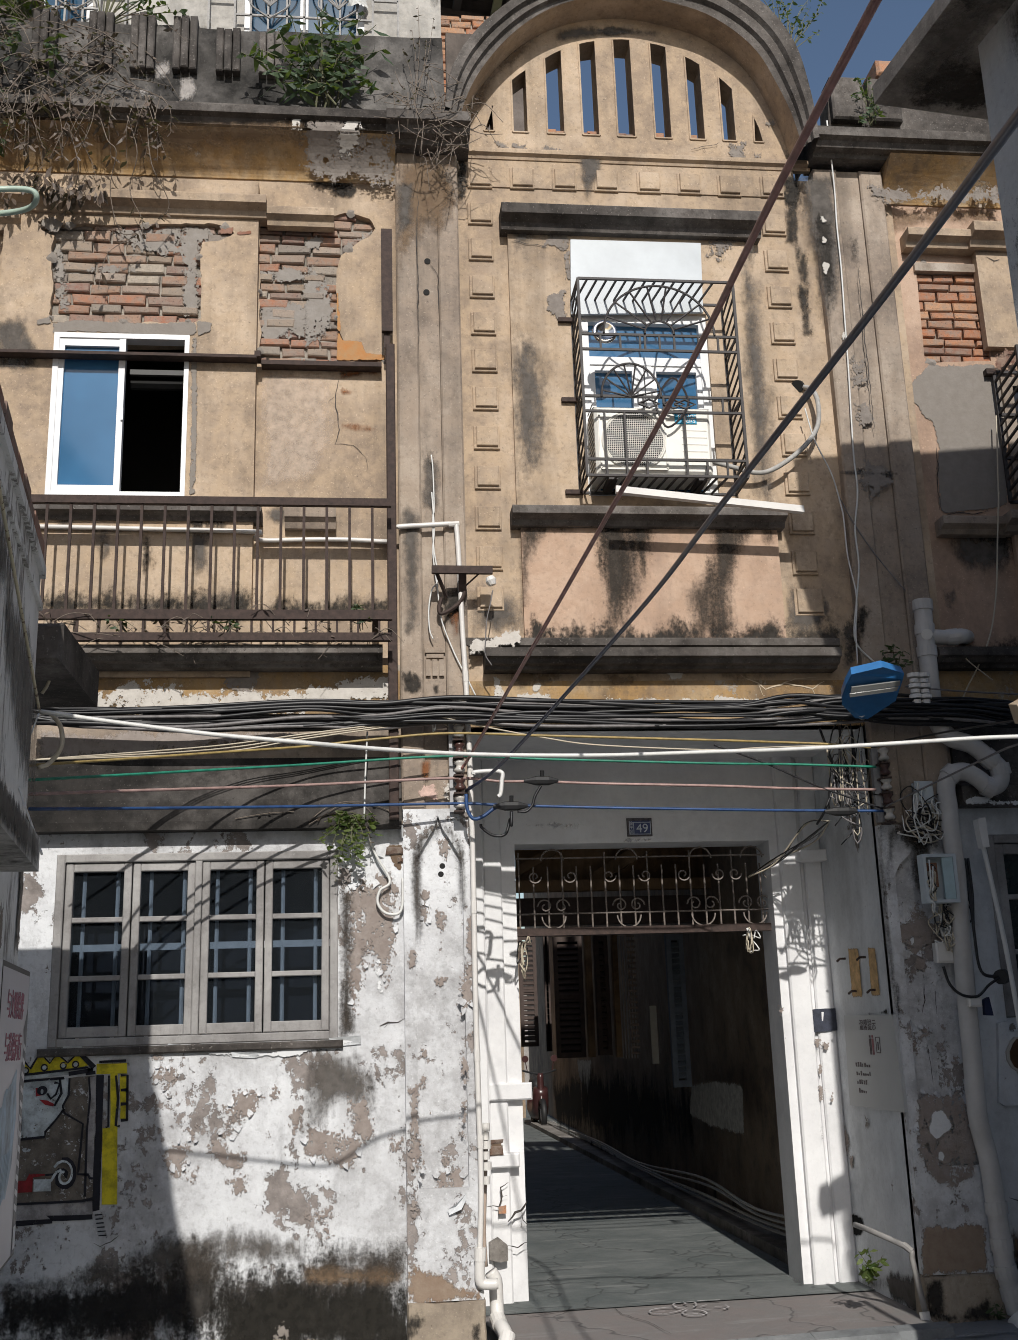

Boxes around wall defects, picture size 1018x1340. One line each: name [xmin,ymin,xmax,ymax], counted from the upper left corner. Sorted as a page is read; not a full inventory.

peeling [290,119,400,188]
leakage [0,321,33,368]
flaking render [39,210,386,364]
leakage [512,341,544,464]
leakage [784,176,857,335]
leakage [529,528,869,665]
leakage [0,518,40,865]
peeling [98,675,388,714]
peeling [341,845,418,1016]
peeling [159,1084,280,1196]
peeling [288,1049,468,1219]
leakage [0,1231,481,1340]